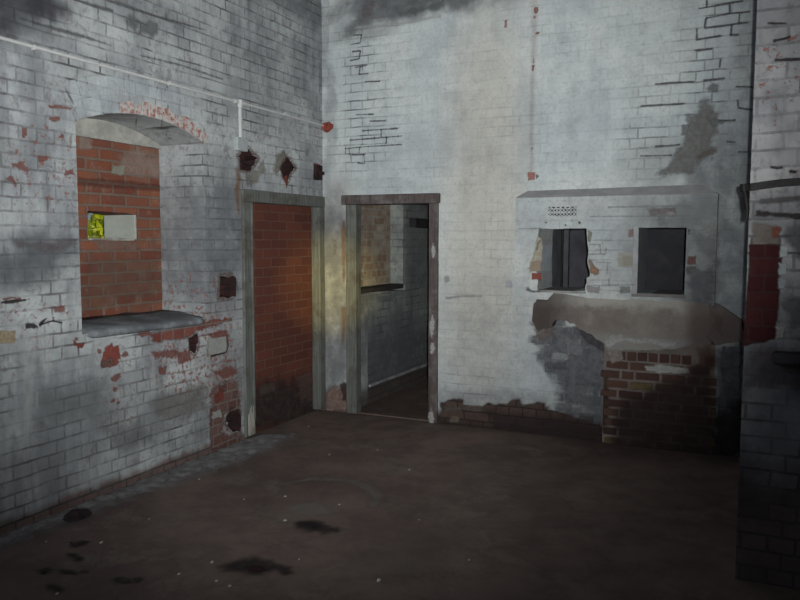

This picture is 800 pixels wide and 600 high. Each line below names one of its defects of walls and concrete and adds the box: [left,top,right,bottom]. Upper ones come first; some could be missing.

flaking render [120,101,207,144]
leakage [660,83,724,175]
spalling [237,146,259,173]
spalling [279,155,297,183]
spalling [217,273,238,300]
spalling [526,237,543,292]
flaking render [743,223,788,346]
spalling [97,343,128,404]
flaking render [138,318,232,375]
flaking render [209,366,241,450]
flaking render [428,343,717,455]